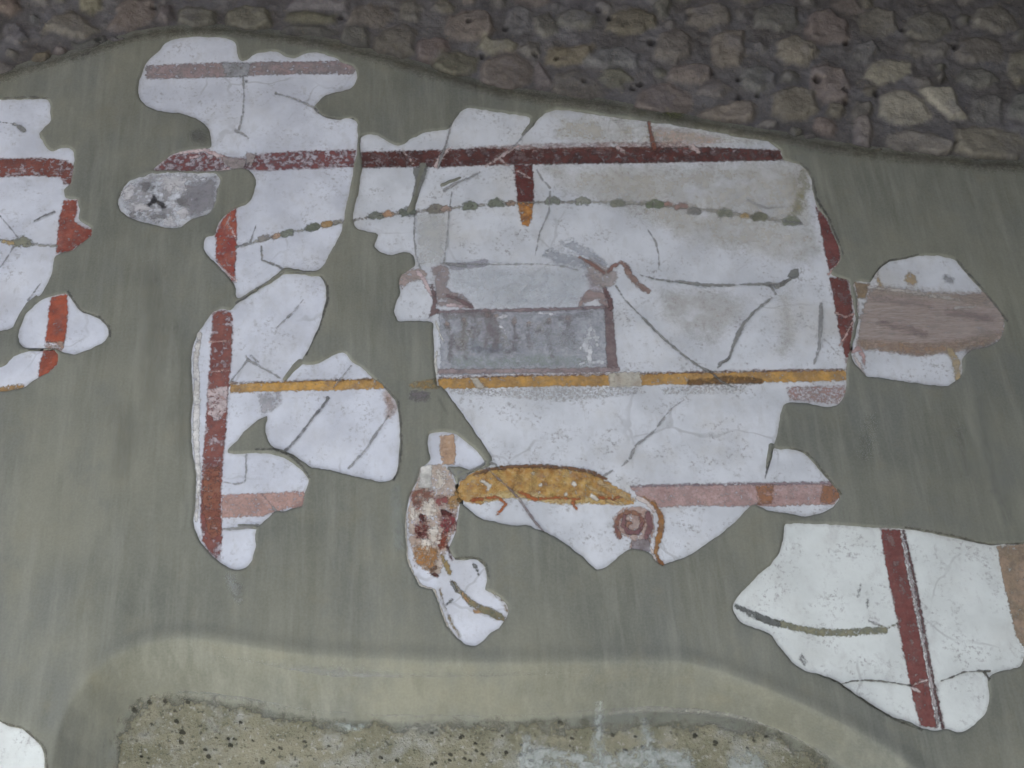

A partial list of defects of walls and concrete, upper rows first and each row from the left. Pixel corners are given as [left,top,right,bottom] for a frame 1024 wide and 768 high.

flaking render [412,166,427,196]
crack [413,124,577,270]
crack [229,355,280,383]
crack [615,230,792,387]
crack [813,303,823,364]
crack [223,365,352,530]
crack [348,381,402,479]
crack [468,461,544,532]
crack [604,402,680,475]
crack [765,448,842,495]
crack [941,670,991,681]
spalling [116,695,827,768]